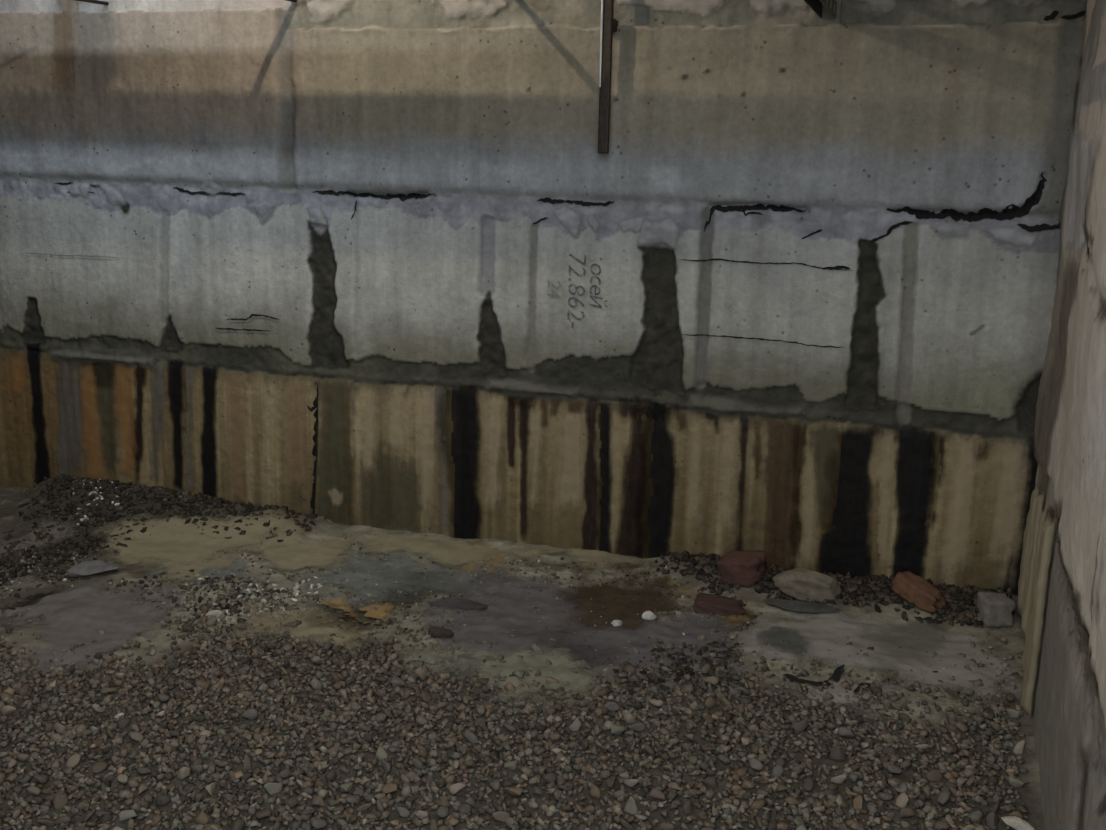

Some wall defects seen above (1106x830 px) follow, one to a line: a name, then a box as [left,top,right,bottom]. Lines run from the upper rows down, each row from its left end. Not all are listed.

spalling [306,0,350,22]
spalling [431,0,506,19]
spalling [616,0,723,17]
crack [869,172,1060,242]
spalling [23,297,45,344]
spalling [160,317,182,351]
spalling [308,206,348,369]
spalling [477,291,506,376]
spalling [630,218,685,396]
spalling [844,239,884,411]
leakage [27,343,116,484]
leakage [0,361,808,681]